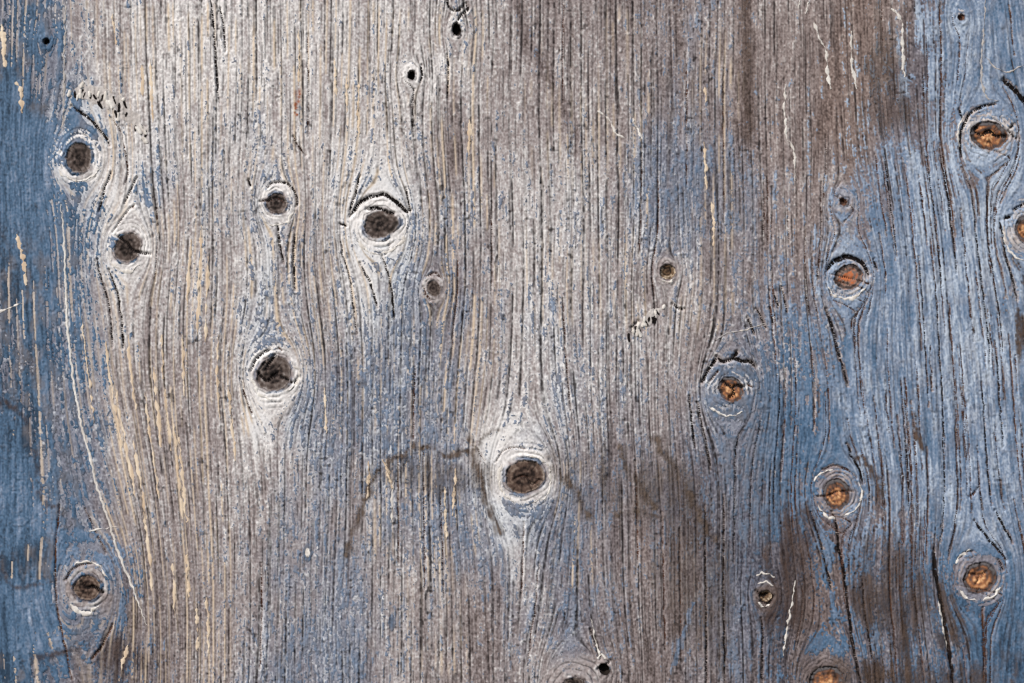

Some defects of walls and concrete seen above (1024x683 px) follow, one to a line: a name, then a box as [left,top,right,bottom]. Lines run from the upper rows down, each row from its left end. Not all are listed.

peeling [420,0,505,75]
peeling [485,105,538,239]